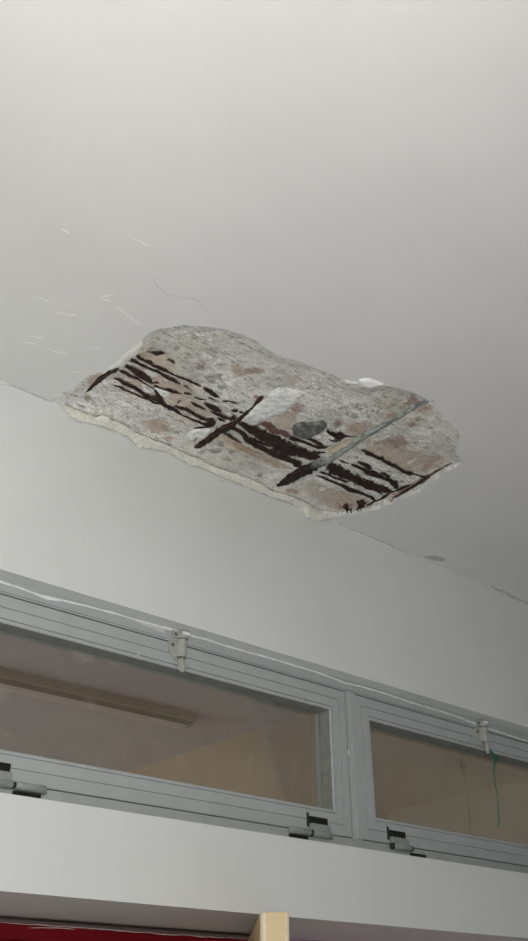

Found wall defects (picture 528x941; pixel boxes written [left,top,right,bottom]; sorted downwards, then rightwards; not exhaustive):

spalling [55,325,462,521]
corrosion [113,348,440,514]